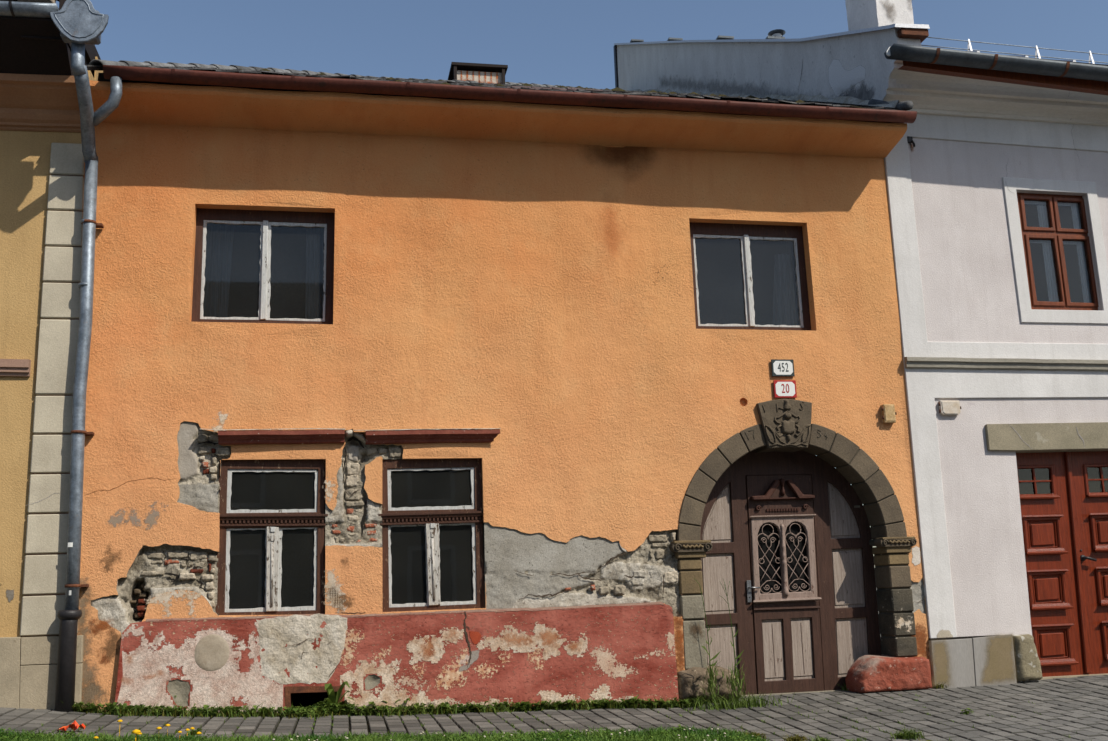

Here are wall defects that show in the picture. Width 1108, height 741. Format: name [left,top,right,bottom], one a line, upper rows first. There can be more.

peeling [108,502,165,530]
spalling [177,412,403,547]
spalling [484,522,681,617]
peeling [91,544,283,719]
peeling [340,622,676,718]